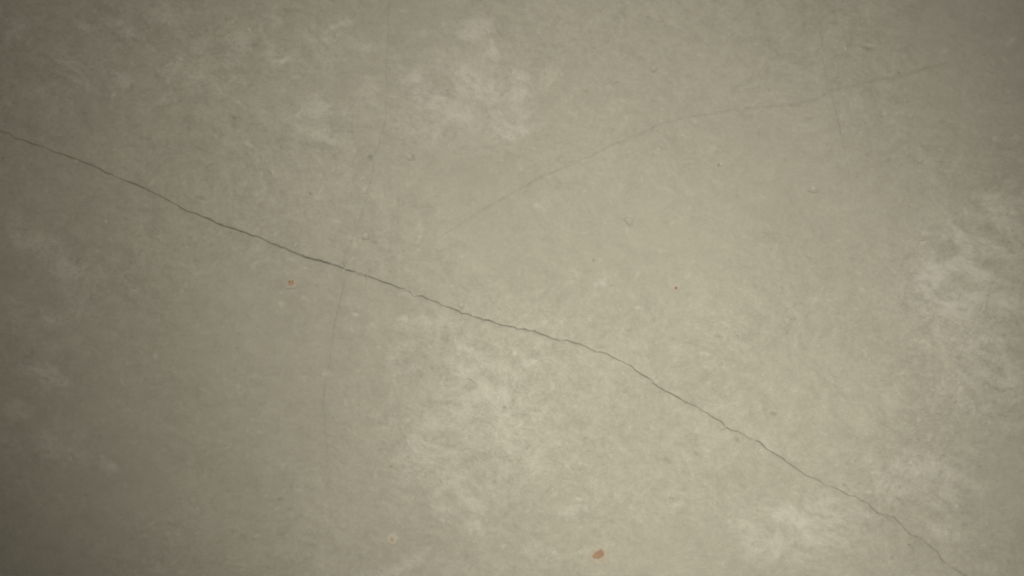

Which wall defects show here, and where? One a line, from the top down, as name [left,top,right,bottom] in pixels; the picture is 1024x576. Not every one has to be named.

crack [0,130,971,576]